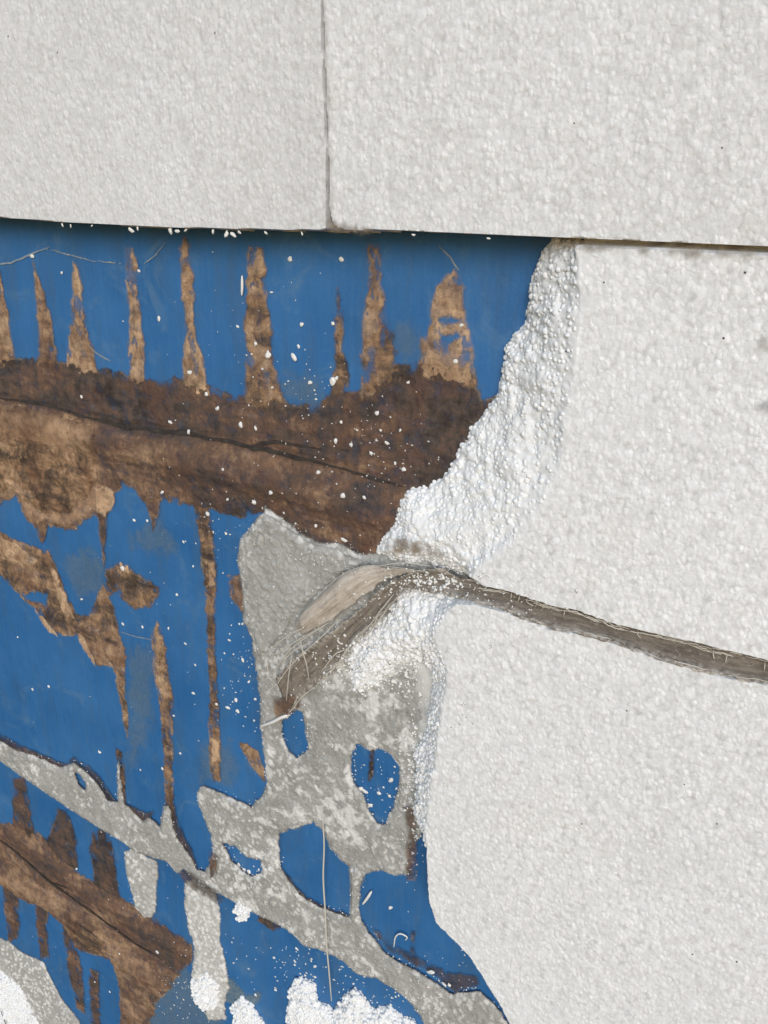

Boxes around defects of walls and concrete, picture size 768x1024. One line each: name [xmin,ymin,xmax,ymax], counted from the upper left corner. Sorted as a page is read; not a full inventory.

spalling [108,0,768,587]
spalling [0,429,115,516]
peeling [0,532,159,737]
crack [0,398,403,487]
rust [0,238,496,782]
peeling [238,513,363,656]
rust [0,737,152,821]
rust [0,778,193,1024]
rust [152,622,222,903]
spalling [348,590,768,947]